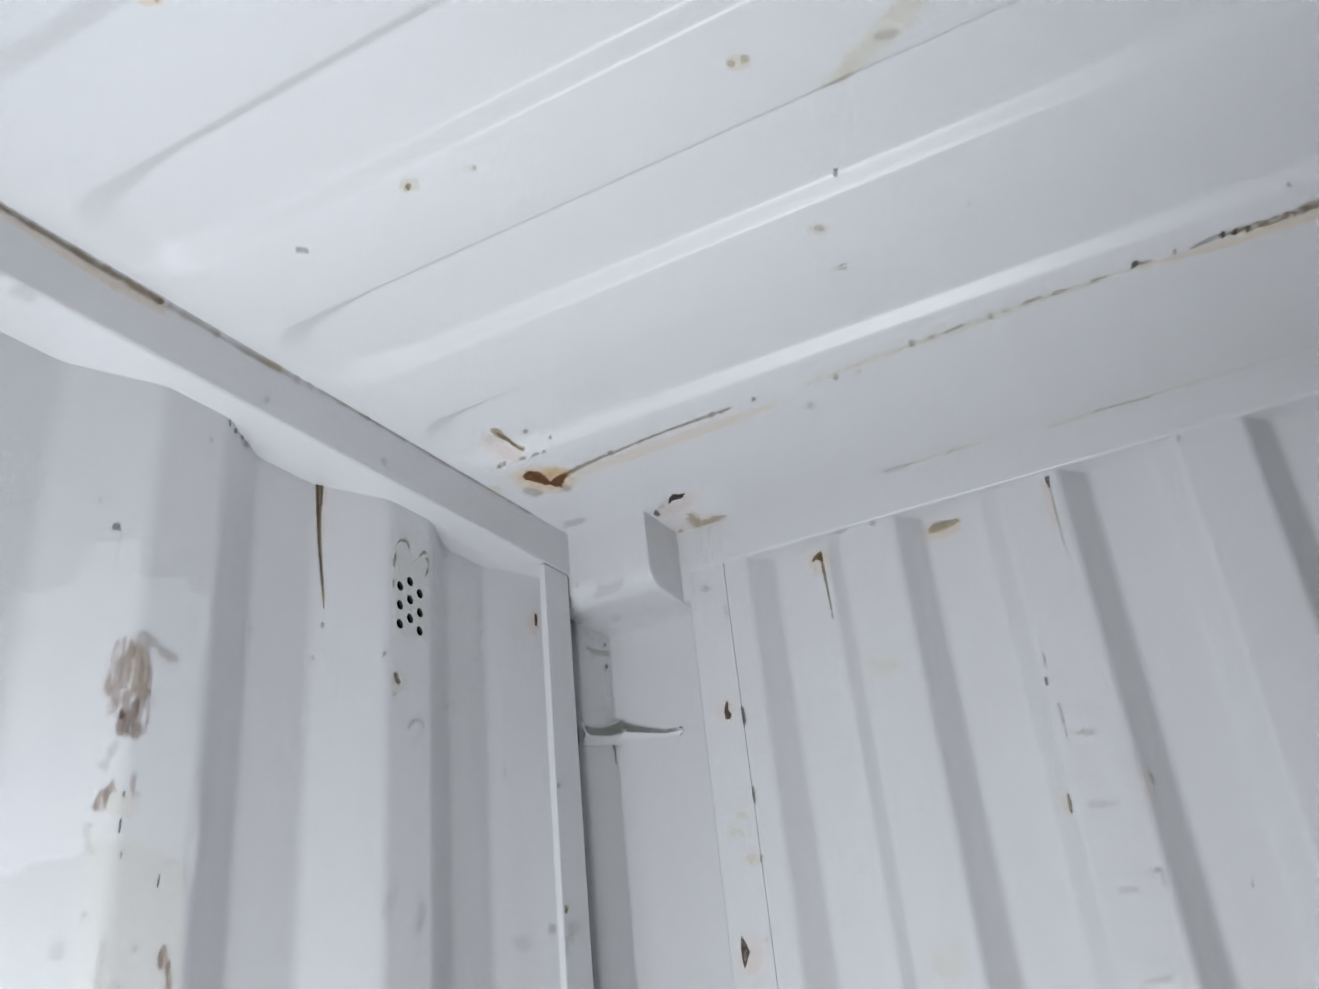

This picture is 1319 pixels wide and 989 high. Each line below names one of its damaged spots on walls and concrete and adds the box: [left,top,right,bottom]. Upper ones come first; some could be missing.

corrosion [491,409,728,487]
corrosion [689,516,724,527]
corrosion [929,518,959,532]
corrosion [812,552,833,615]